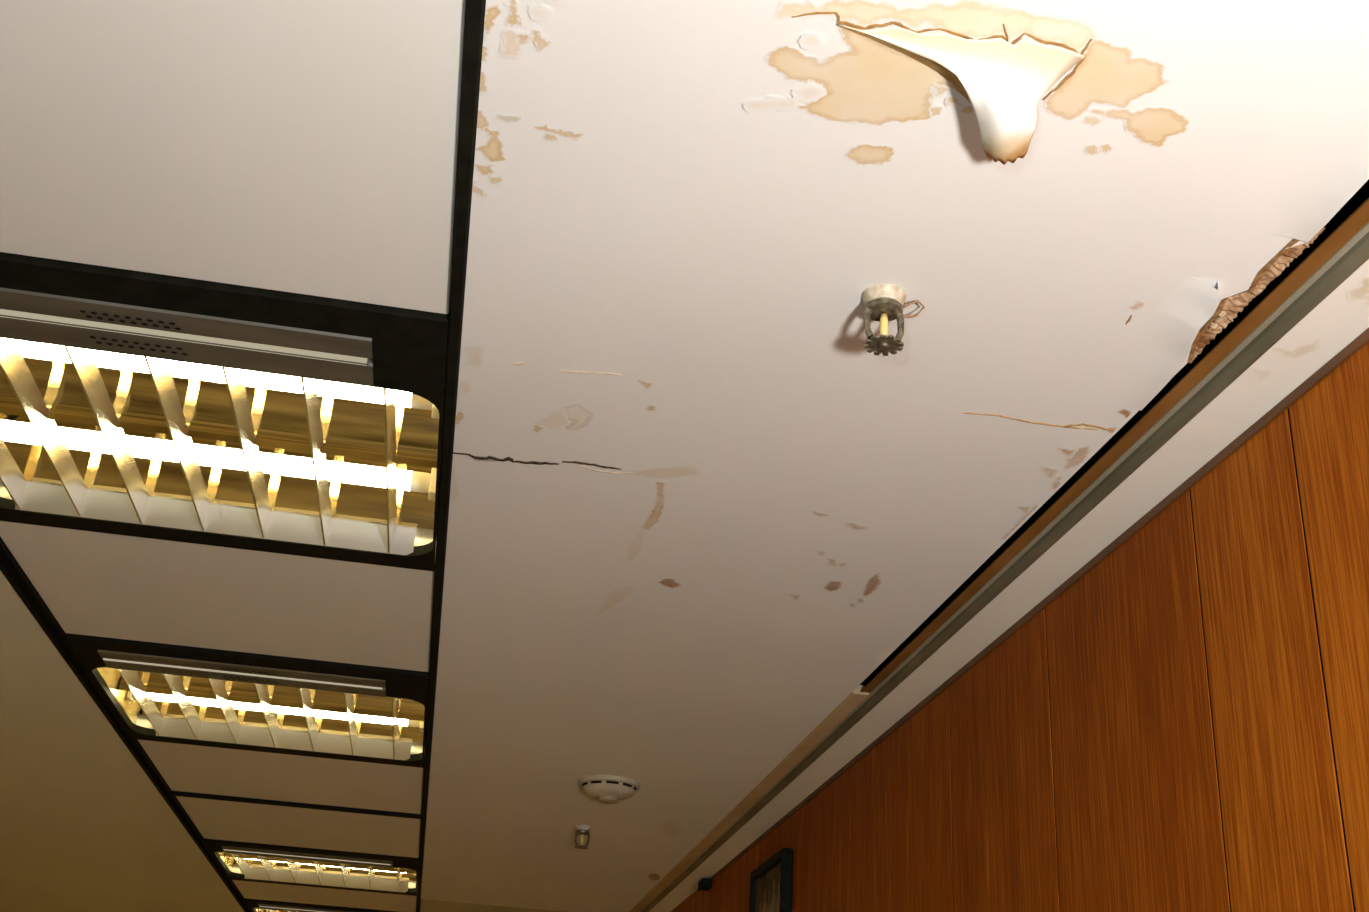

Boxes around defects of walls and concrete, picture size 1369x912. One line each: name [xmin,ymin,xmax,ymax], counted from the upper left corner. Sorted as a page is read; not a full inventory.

peeling [472,0,565,198]
leakage [844,144,896,166]
spalling [1109,227,1325,410]
crack [453,452,634,474]